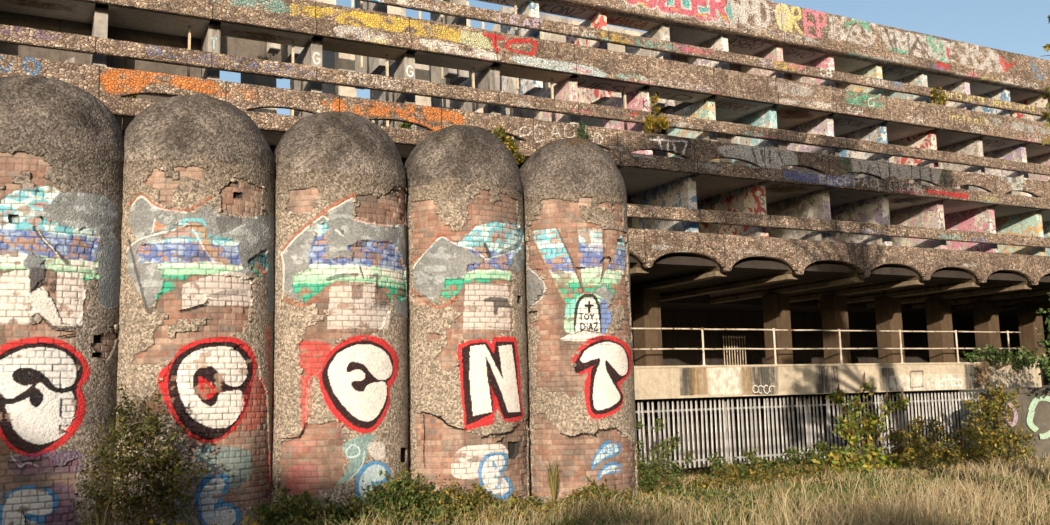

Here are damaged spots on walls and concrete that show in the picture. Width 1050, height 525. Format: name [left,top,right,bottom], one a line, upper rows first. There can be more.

flaking render [0,152,61,204]
flaking render [143,166,209,208]
flaking render [215,178,266,217]
flaking render [287,187,320,215]
flaking render [0,306,77,351]
flaking render [0,268,97,312]
flaking render [91,324,119,363]
flaking render [131,265,258,365]
flaking render [297,281,391,377]
flaking render [351,187,631,398]
flaking render [140,358,350,516]
flaking render [0,435,80,525]